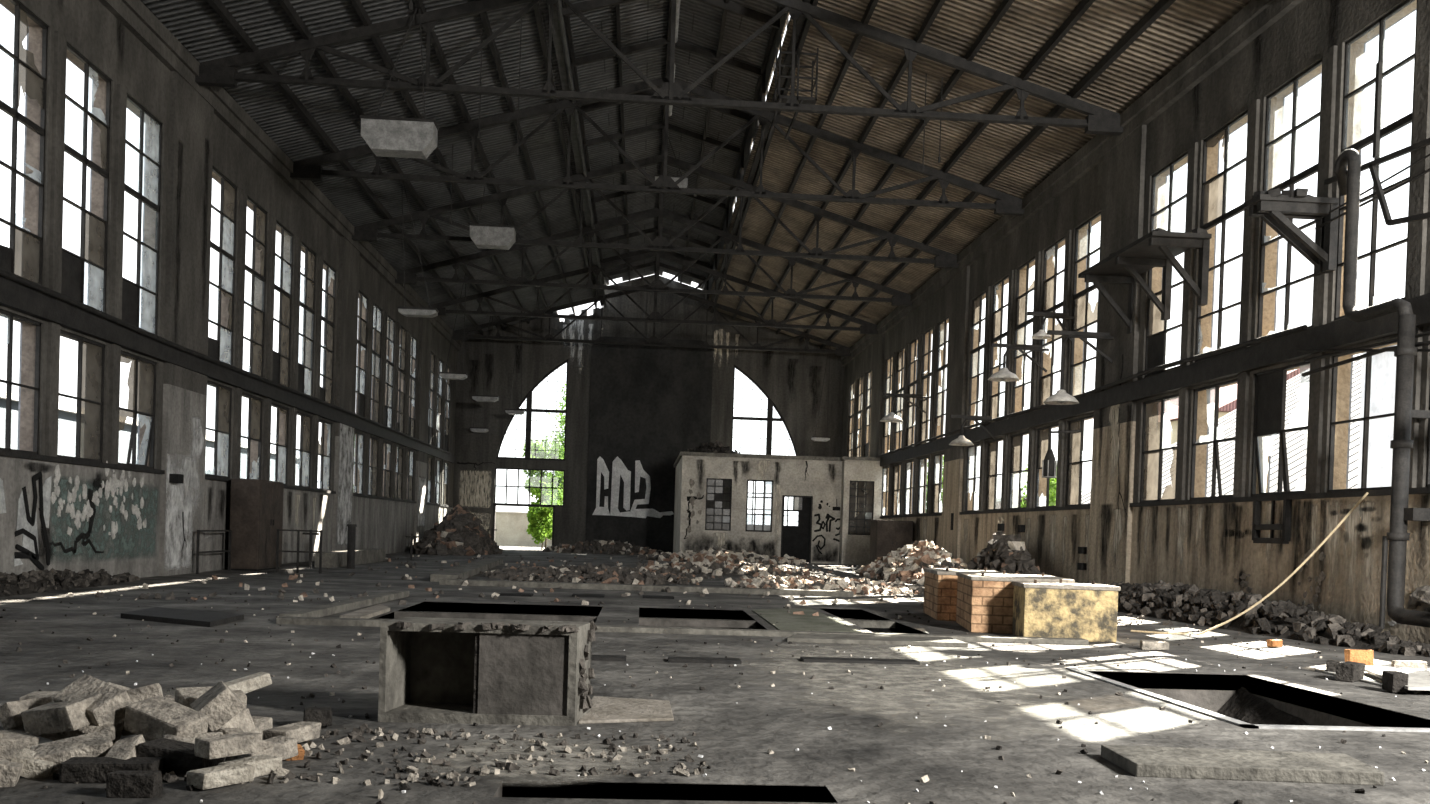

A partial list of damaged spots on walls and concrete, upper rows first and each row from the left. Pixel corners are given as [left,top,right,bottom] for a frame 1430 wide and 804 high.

water stain [1267,500,1374,585]